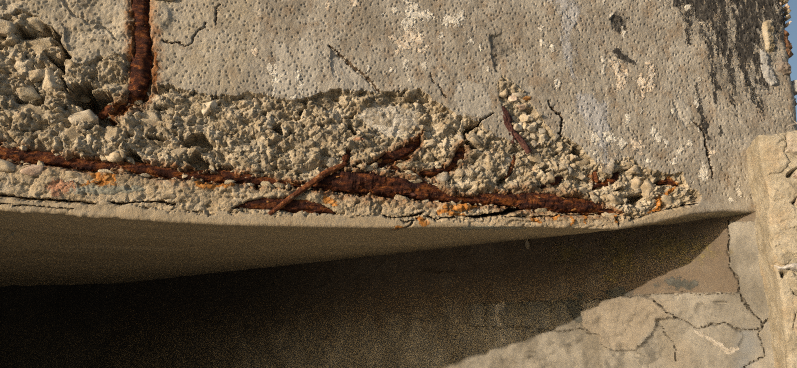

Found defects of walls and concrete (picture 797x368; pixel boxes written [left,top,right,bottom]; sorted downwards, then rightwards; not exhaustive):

crack [0,194,176,209]
corrosion [98,0,159,126]
crack [162,4,221,47]
corrosion [0,136,620,227]
spalling [0,8,702,229]
leakage [381,0,467,82]
corrosion [501,106,532,154]
crack [548,100,564,137]
leakage [601,48,657,114]
leakage [589,126,693,165]
leakage [661,0,785,183]
crack [468,220,768,368]